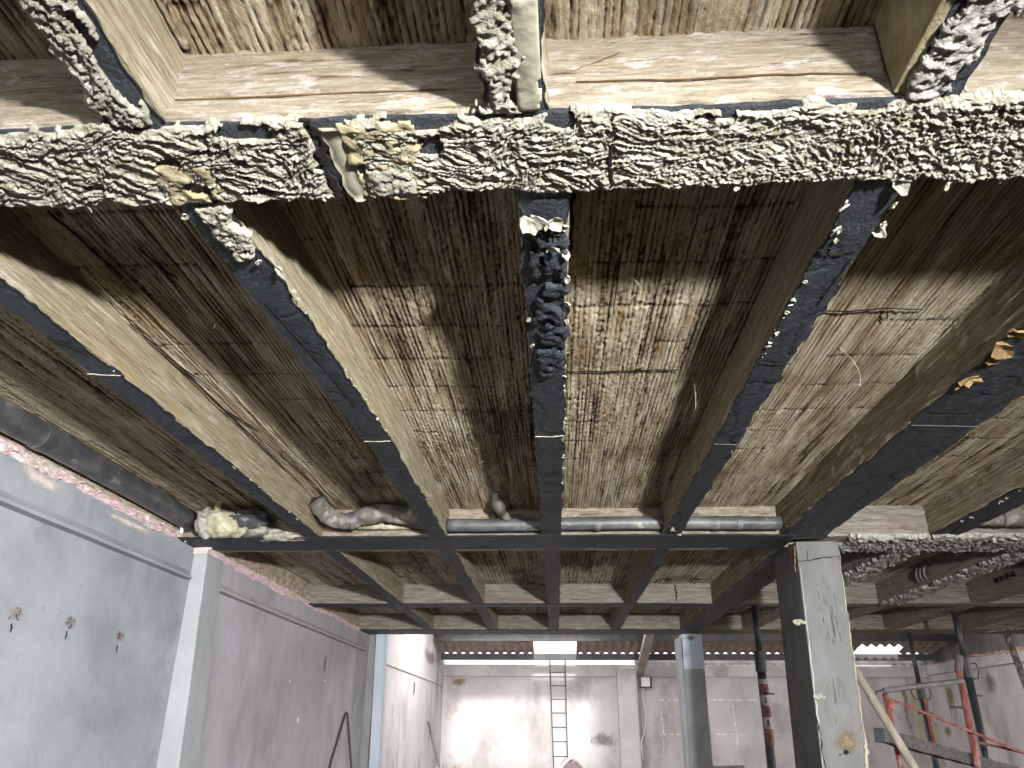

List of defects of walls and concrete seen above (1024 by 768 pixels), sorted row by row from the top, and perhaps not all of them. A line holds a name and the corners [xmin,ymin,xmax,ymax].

spalling [986,323,1024,366]
spalling [954,376,983,391]